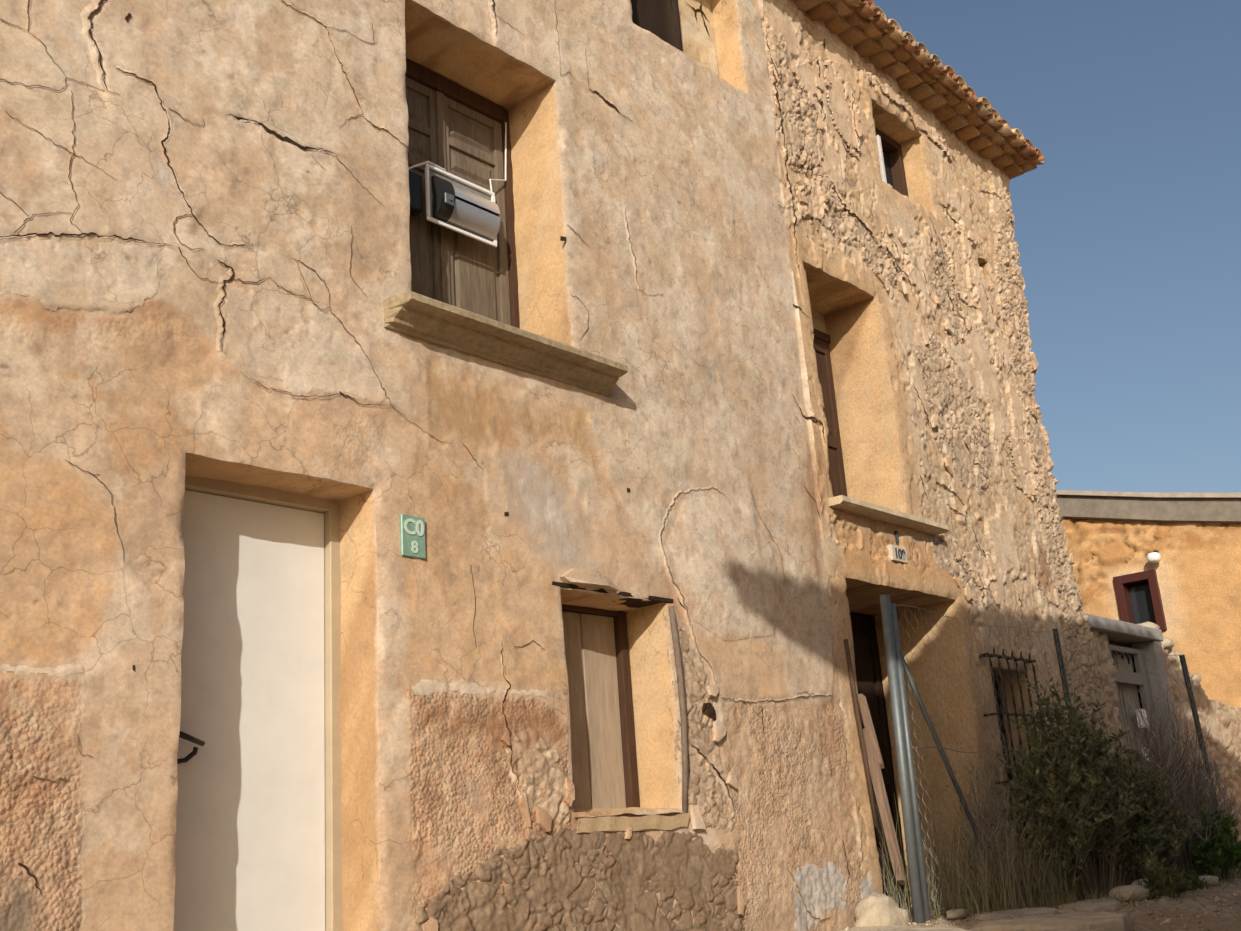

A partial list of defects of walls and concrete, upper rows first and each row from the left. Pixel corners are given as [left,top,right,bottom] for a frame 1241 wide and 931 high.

crack [487,0,523,36]
crack [0,0,483,469]
crack [792,392,827,443]
spalling [767,30,1121,762]
crack [472,574,545,796]
crack [658,485,832,733]